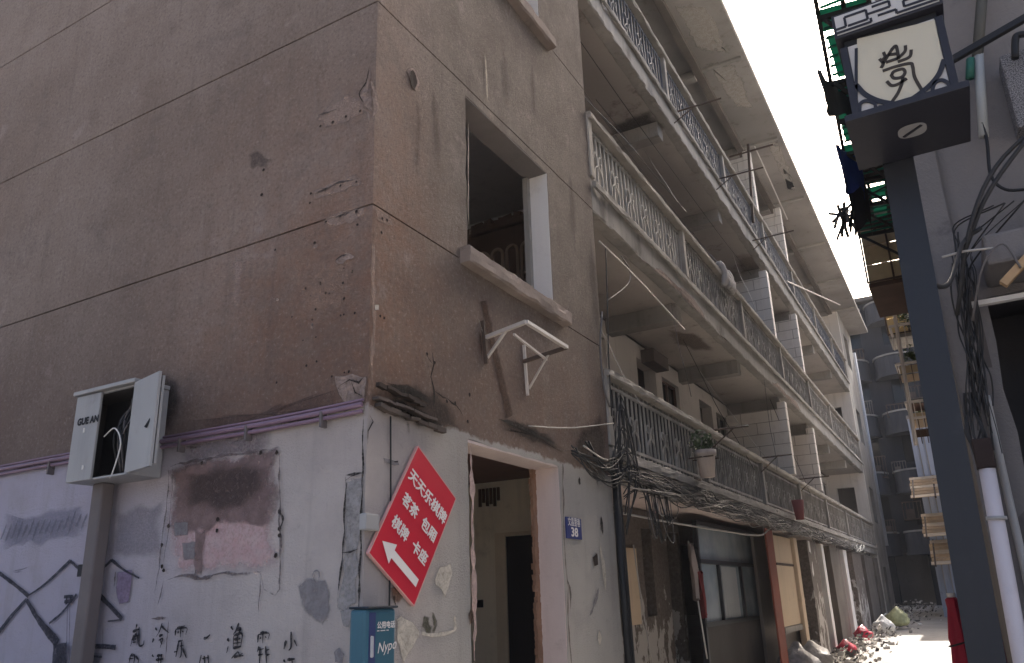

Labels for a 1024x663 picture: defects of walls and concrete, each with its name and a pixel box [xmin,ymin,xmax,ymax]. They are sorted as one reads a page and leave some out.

peeling [156,447,284,611]
spalling [337,472,363,627]